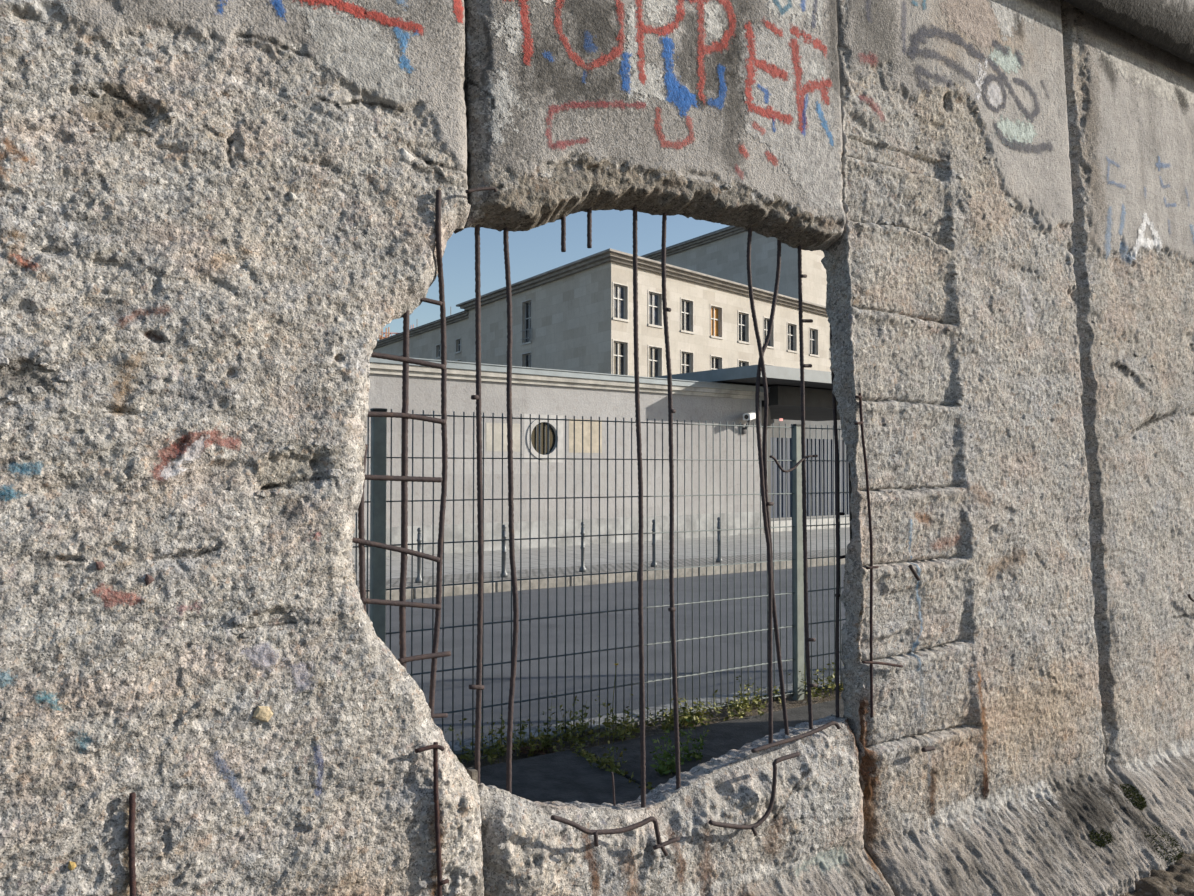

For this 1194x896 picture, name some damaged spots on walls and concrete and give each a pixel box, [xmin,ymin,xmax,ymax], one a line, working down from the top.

spalling [469,0,1062,890]
rust [847,695,883,879]
rust [978,671,990,798]